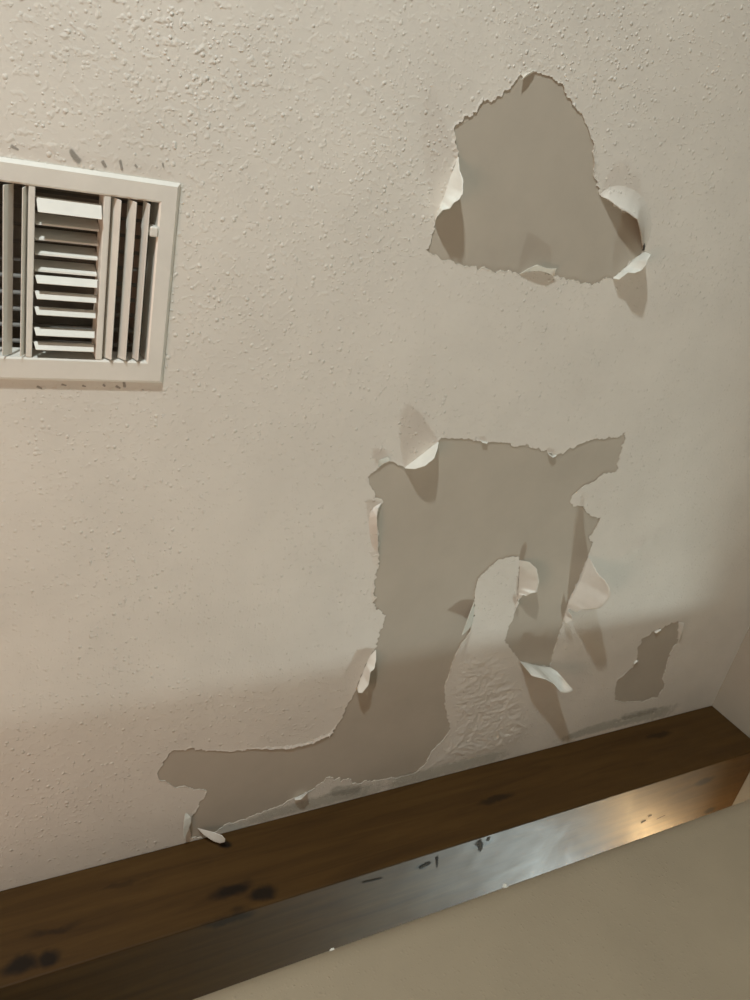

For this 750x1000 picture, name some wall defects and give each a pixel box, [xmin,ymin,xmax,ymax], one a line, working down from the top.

peeling [425,70,651,287]
peeling [156,432,626,843]
peeling [614,621,684,704]